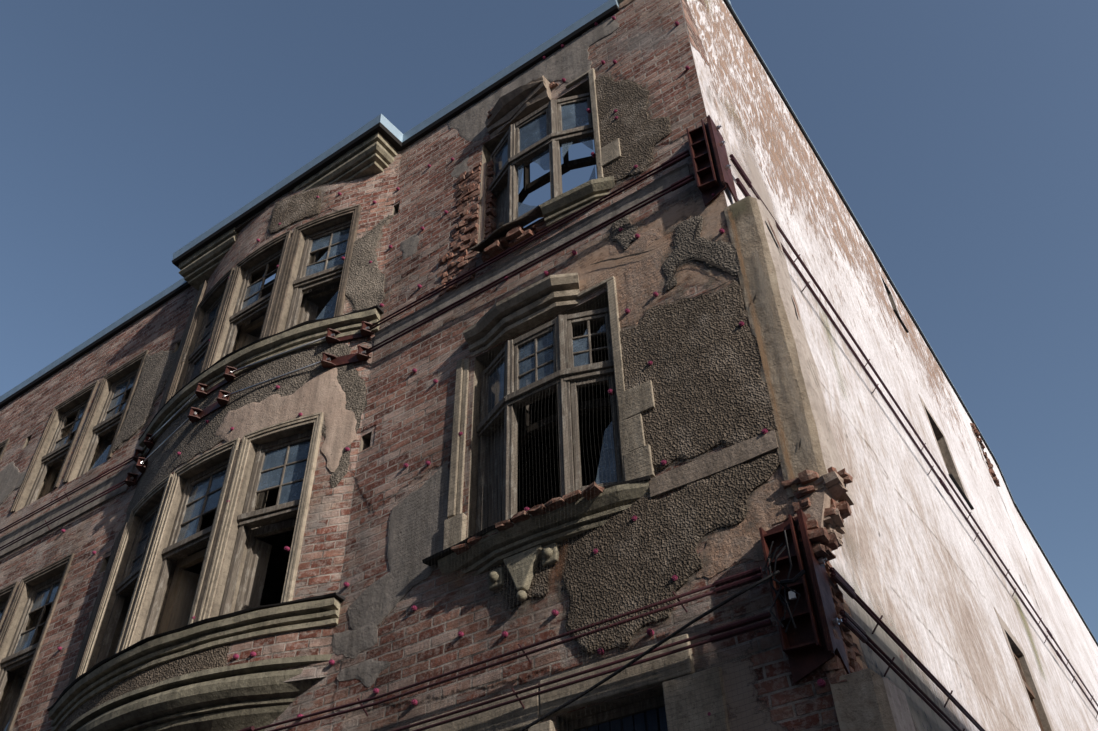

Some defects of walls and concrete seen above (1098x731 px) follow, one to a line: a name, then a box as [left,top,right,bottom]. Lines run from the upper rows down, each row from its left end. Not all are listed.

peeling [615,0,1000,487]
peeling [215,317,485,515]
peeling [688,467,959,731]